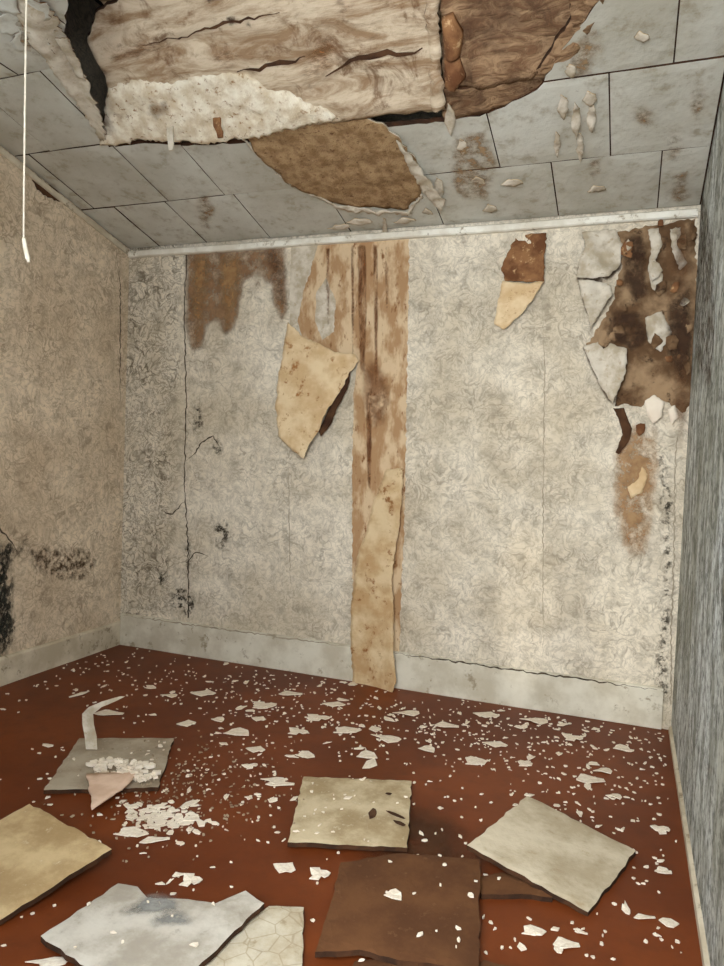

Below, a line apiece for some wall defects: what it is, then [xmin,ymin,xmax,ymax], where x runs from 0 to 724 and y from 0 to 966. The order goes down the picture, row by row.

peeling [0,0,52,53]
peeling [444,104,467,155]
peeling [557,91,597,164]
flaking render [577,219,697,436]
water stain [616,432,673,548]
water stain [0,544,14,654]
water stain [657,609,669,694]